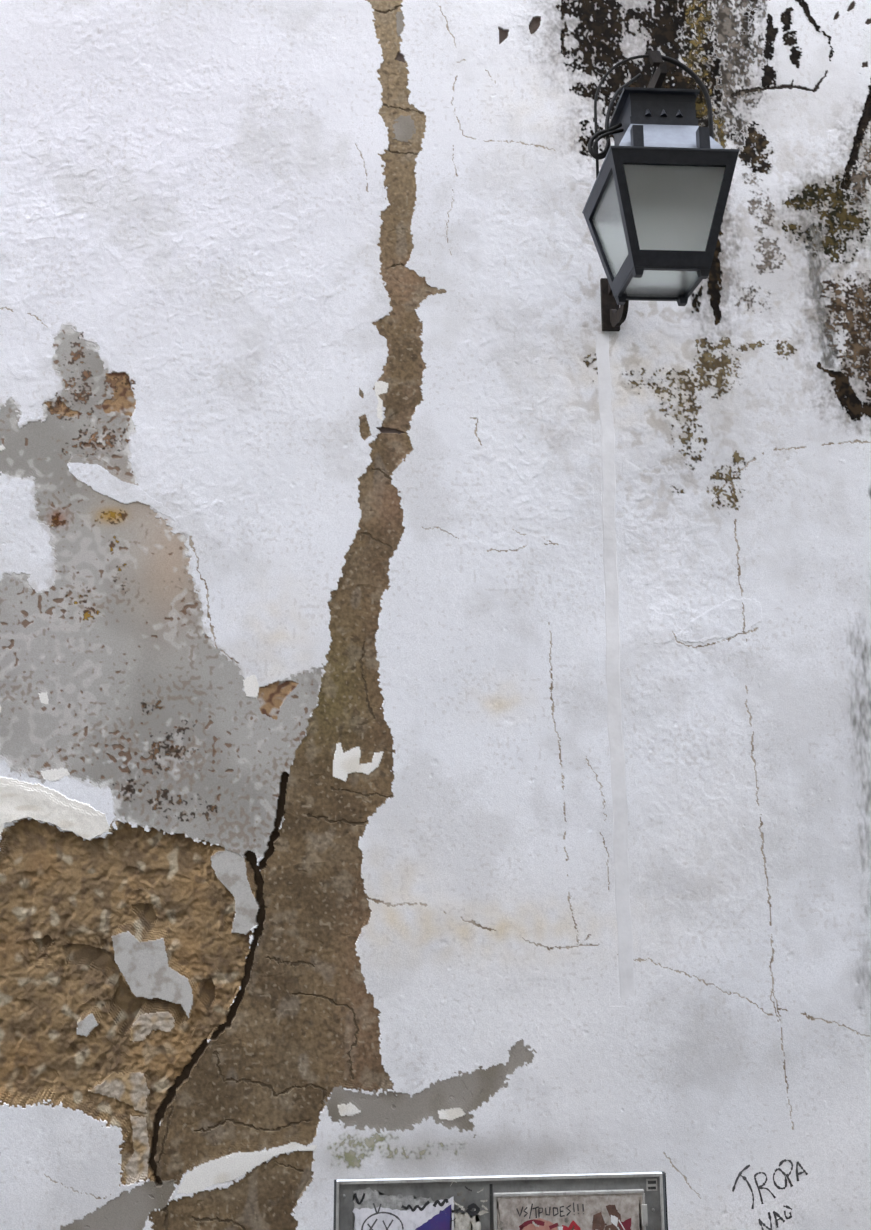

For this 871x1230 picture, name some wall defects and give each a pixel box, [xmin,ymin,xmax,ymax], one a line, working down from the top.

damp [556,0,834,309]
damp [840,78,871,203]
damp [622,220,797,470]
damp [817,272,871,422]
damp [707,450,746,510]
peeling [0,0,535,1230]
crack [148,772,289,1186]